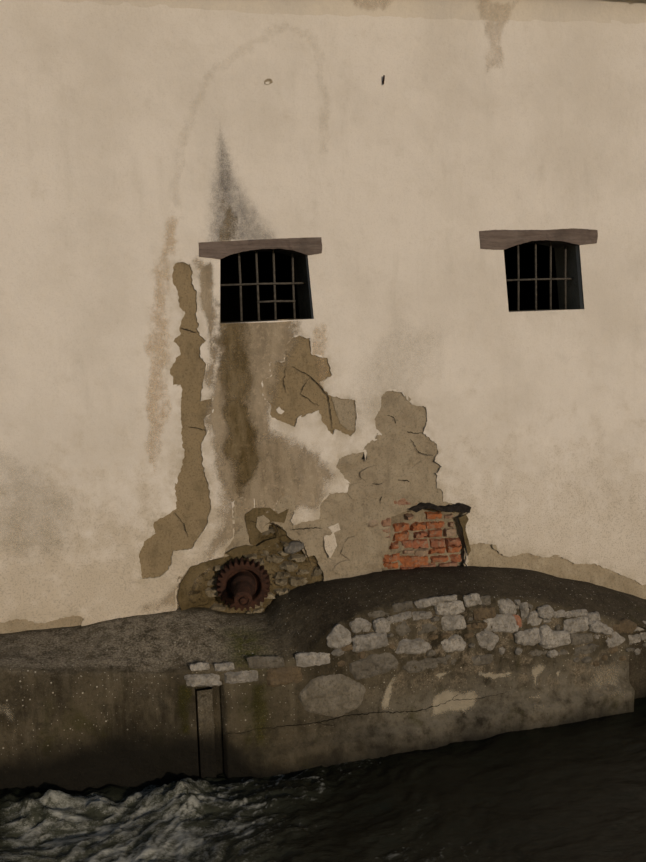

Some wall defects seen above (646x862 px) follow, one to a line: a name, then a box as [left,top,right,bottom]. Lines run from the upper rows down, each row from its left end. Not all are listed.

flaking render [139,262,214,579]
water stain [196,260,332,556]
flaking render [261,335,358,436]
flaking render [176,389,646,614]
crack [229,693,504,734]